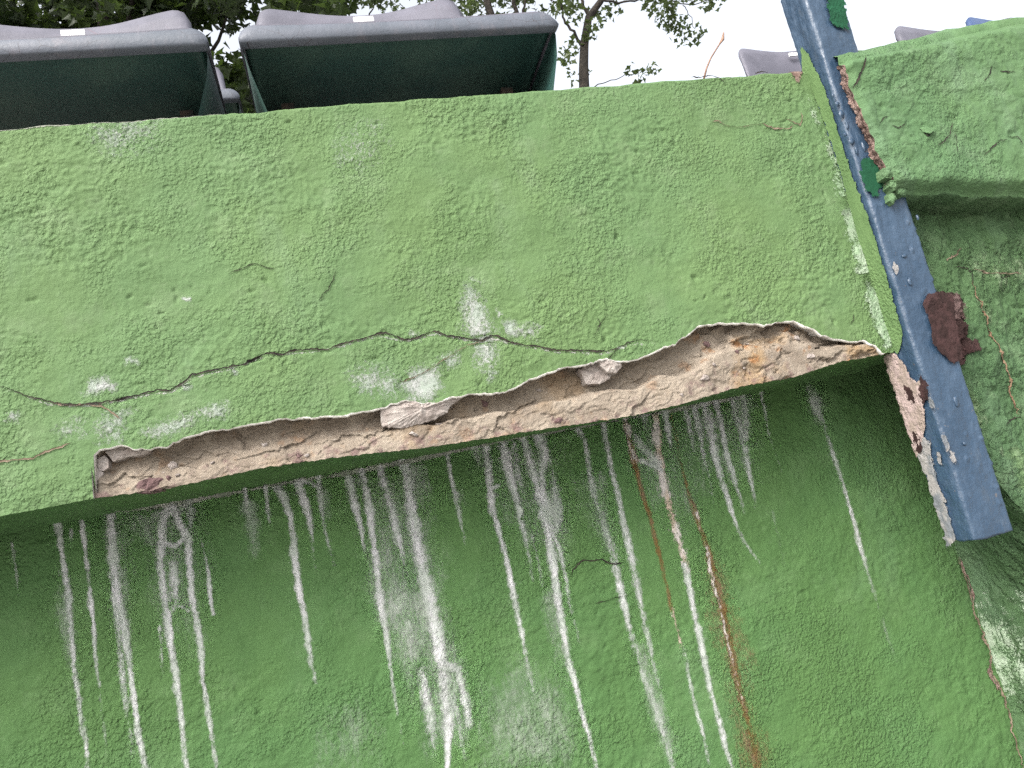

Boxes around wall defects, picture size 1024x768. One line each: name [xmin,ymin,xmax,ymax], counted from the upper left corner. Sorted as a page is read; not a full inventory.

crack [0,314,659,418]
efflorescence [352,354,457,401]
efflorescence [463,287,497,381]
efflorescence [498,313,538,336]
spalling [91,140,956,547]
corrosion [923,291,982,366]
corrosion [622,418,664,571]
leakage [831,451,866,564]
leakage [54,520,89,753]
leakage [88,588,100,685]
leakage [107,395,766,768]
corrosion [685,481,759,768]